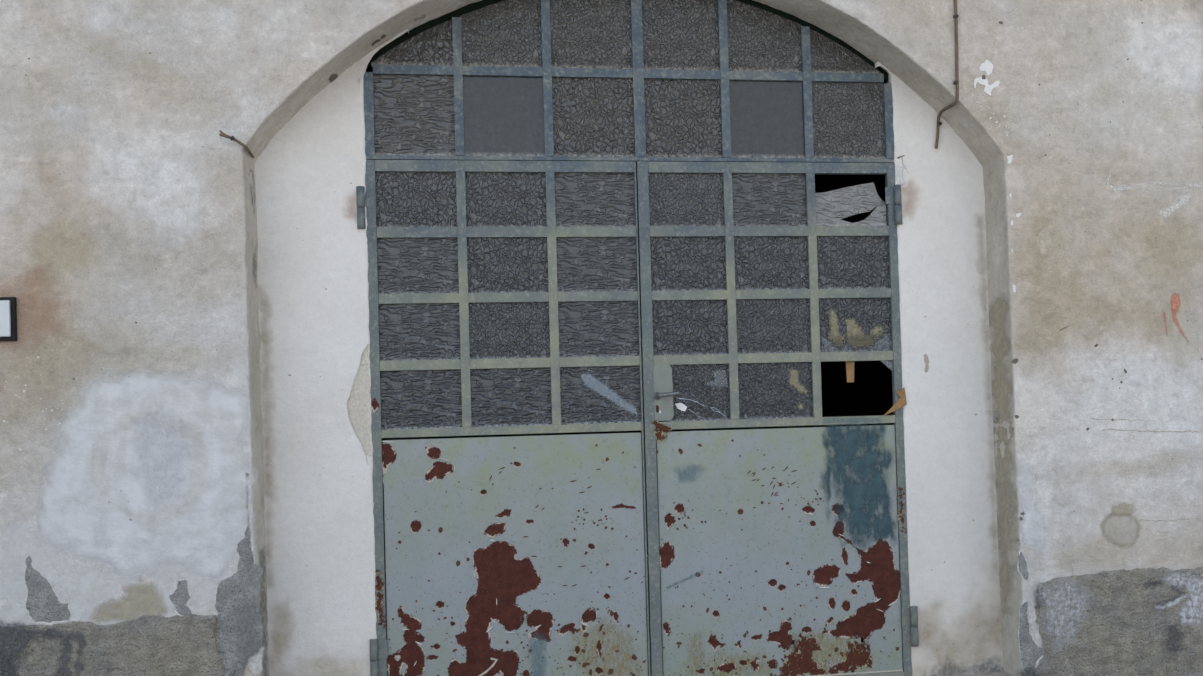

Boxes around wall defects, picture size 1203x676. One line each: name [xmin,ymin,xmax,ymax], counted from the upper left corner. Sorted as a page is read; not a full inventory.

rust [382,441,397,483]
rust [425,447,455,483]
rust [897,484,907,533]
spalling [24,556,71,624]
water stain [96,585,164,620]
spalling [169,578,193,616]
spalling [215,524,264,676]
rust [375,509,632,676]
rust [694,503,901,676]
spalling [1017,540,1044,676]